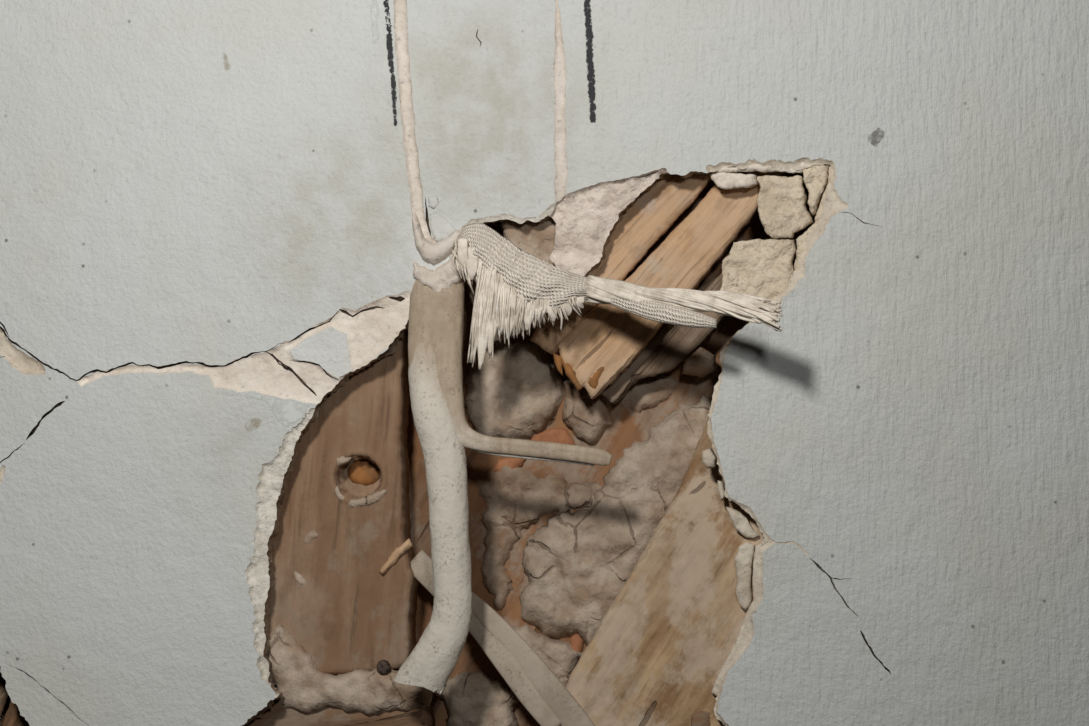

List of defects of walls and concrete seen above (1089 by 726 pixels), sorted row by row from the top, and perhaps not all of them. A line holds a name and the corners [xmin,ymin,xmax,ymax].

flaking render [429,157,848,306]
crack [0,296,405,483]
flaking render [77,291,411,726]
peeling [530,427,576,445]
flaking render [691,322,776,726]
crack [765,537,891,674]